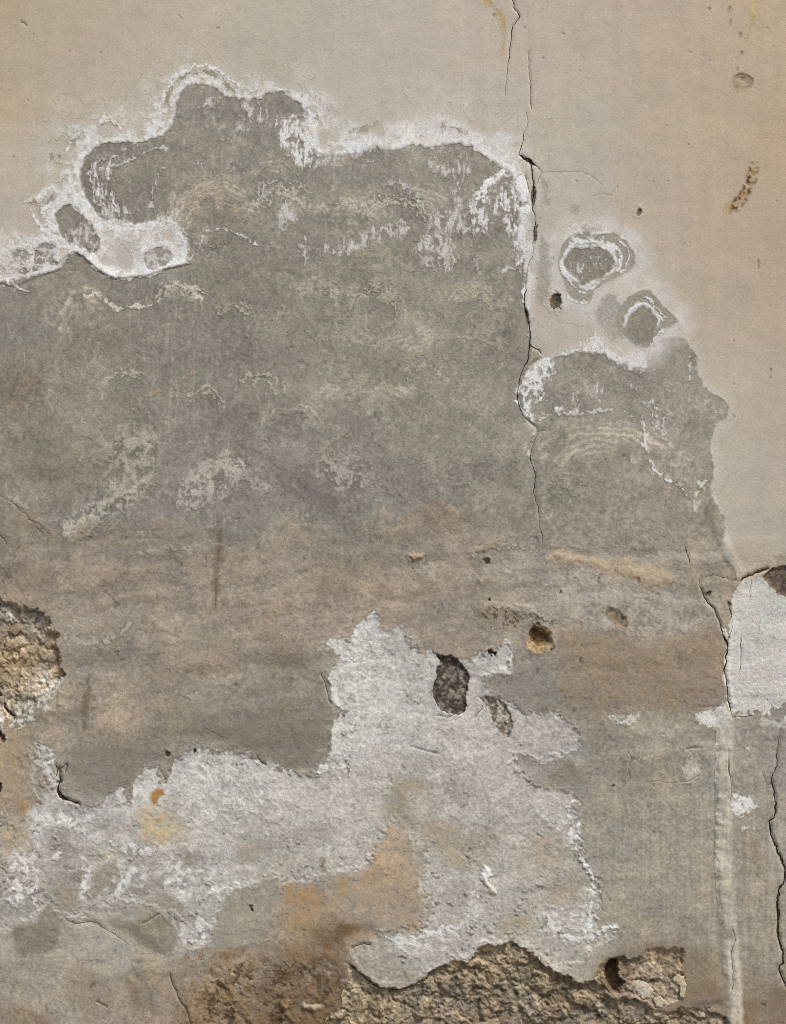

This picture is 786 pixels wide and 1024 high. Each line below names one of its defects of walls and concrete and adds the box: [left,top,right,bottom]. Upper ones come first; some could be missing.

water stain [0,40,739,611]
crack [505,0,610,545]
flaking render [0,597,726,1024]
crack [685,548,769,717]
flaking render [722,576,786,719]
crack [762,744,786,986]